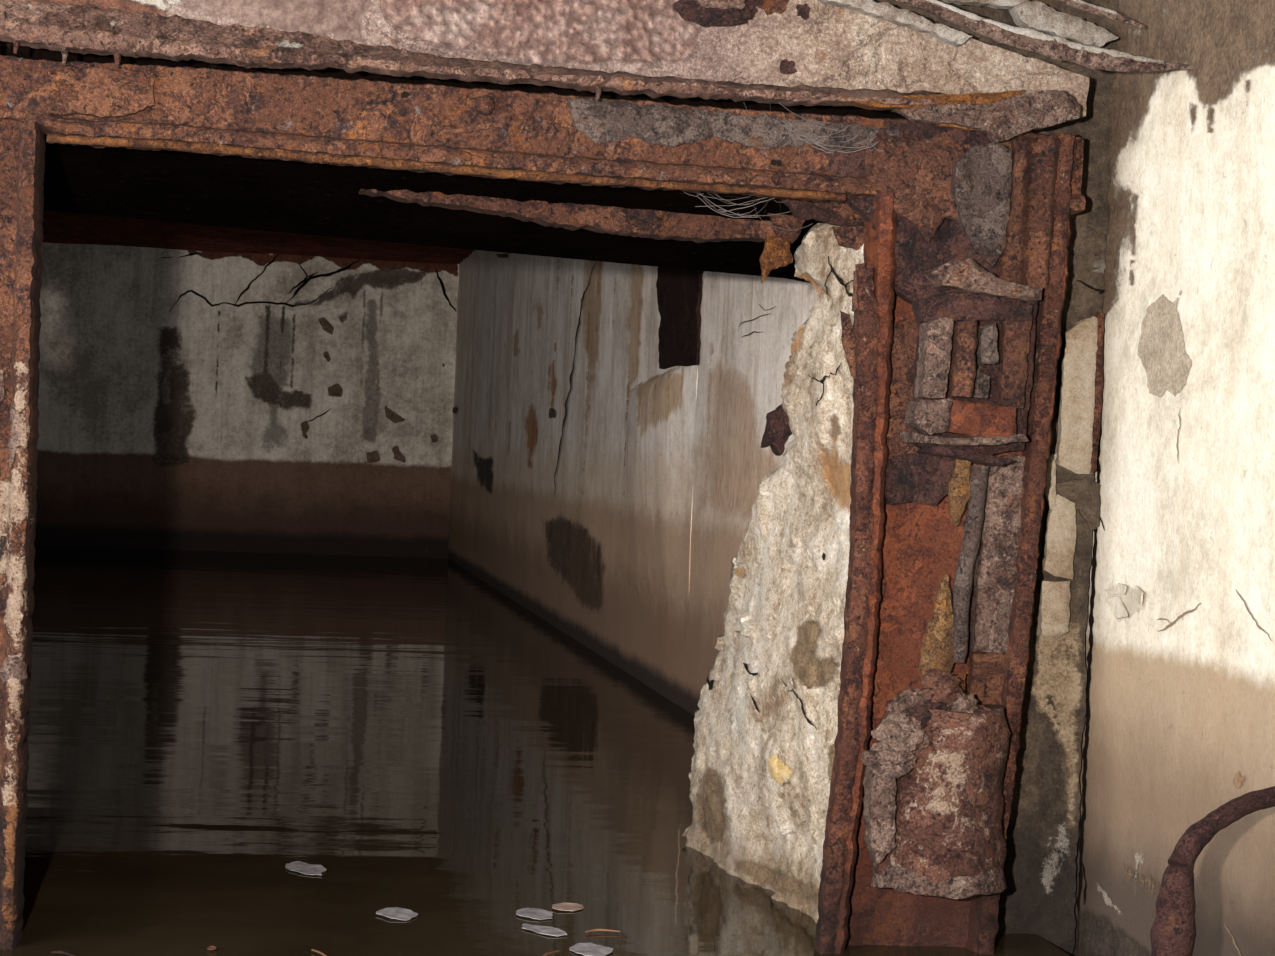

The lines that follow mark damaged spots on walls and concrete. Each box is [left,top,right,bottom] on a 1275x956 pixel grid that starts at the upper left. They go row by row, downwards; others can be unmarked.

corrosion [358,189,866,296]
crack [169,254,360,312]
crack [436,269,456,311]
crack [554,261,597,493]
corrosion [557,260,683,434]
spalling [1138,291,1191,397]
corrosion [525,404,538,468]
corrosion [830,414,839,460]
peeling [1106,583,1145,620]
spalling [783,619,840,701]
spalling [768,754,793,787]
spalling [827,744,835,780]